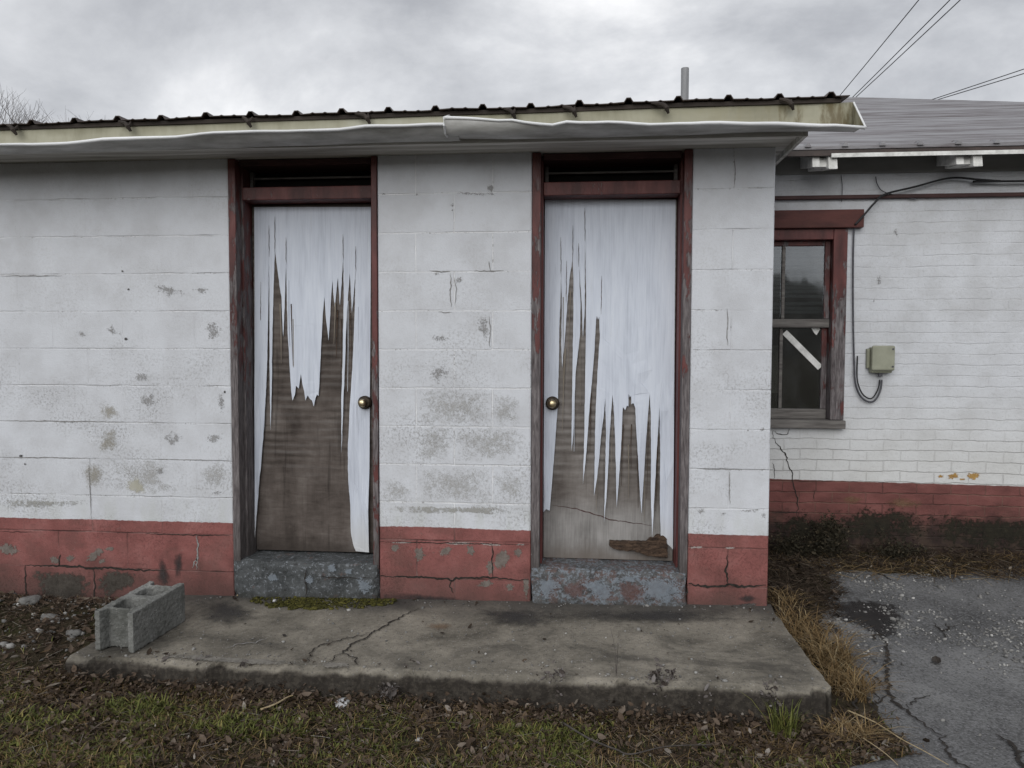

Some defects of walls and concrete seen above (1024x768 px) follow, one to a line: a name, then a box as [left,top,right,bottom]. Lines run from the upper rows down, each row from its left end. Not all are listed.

crack [772,430,815,517]
water stain [835,506,1024,552]
crack [304,541,528,595]
peeling [439,542,682,604]
crack [685,557,762,604]
crack [307,609,417,664]
crack [845,632,970,768]
crack [996,734,1024,768]